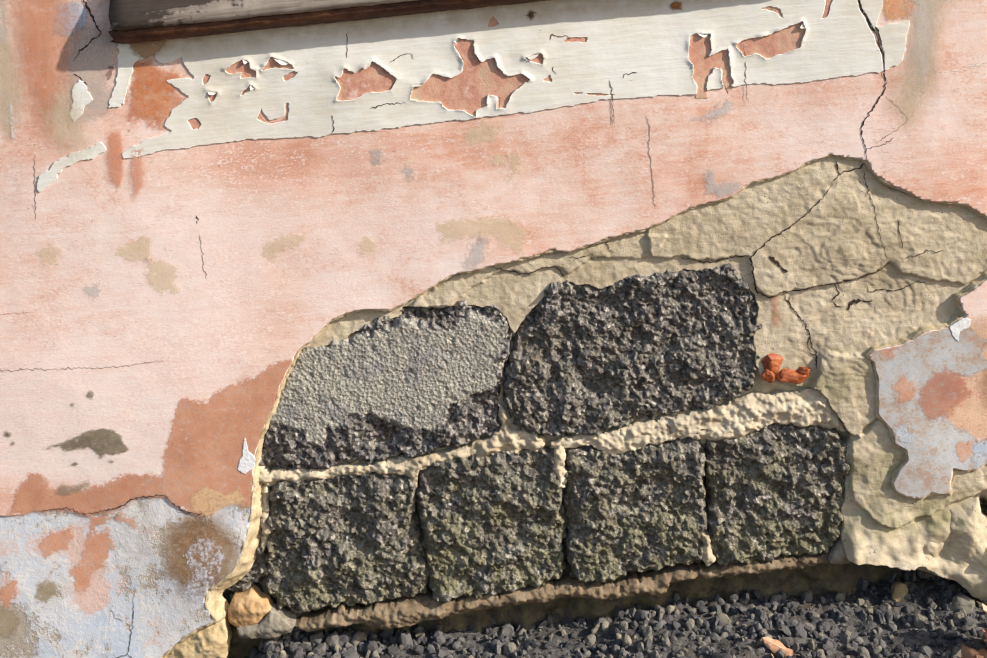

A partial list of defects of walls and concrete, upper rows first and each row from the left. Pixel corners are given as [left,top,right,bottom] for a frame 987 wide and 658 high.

peeling [69,80,93,122]
peeling [108,43,144,108]
peeling [203,74,217,102]
peeling [226,57,297,95]
peeling [335,61,396,101]
peeling [410,38,530,120]
peeling [526,54,544,64]
peeling [689,6,806,122]
peeling [37,142,107,192]
crack [682,0,946,368]
flaking render [0,154,987,658]
crack [111,591,136,658]